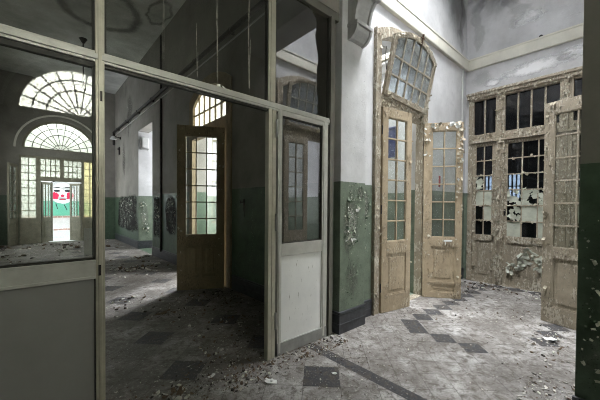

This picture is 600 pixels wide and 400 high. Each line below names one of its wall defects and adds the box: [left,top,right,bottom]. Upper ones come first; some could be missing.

peeling [377,32,583,278]
peeling [118,195,160,237]
peeling [344,183,389,256]